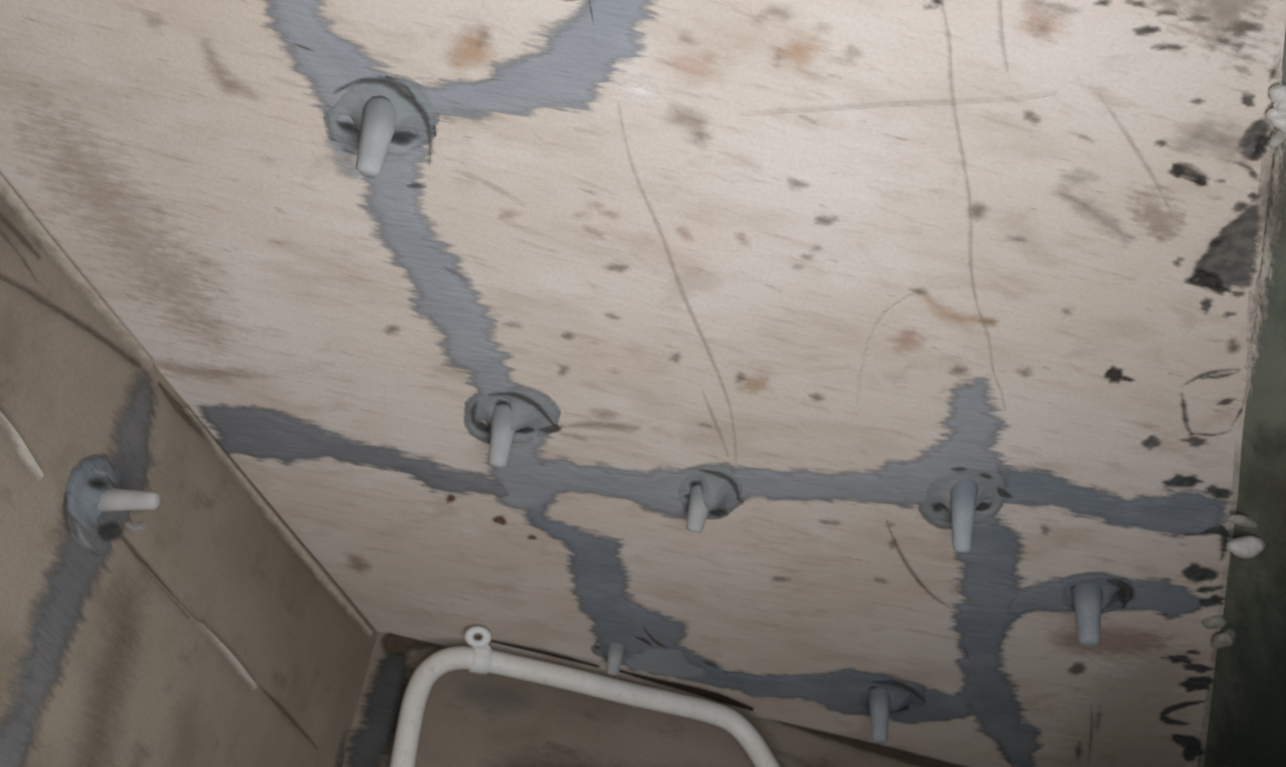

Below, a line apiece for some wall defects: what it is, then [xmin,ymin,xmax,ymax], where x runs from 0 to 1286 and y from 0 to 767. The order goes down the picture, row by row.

crack [266,0,388,133]
crack [360,0,653,405]
crack [0,215,1229,767]